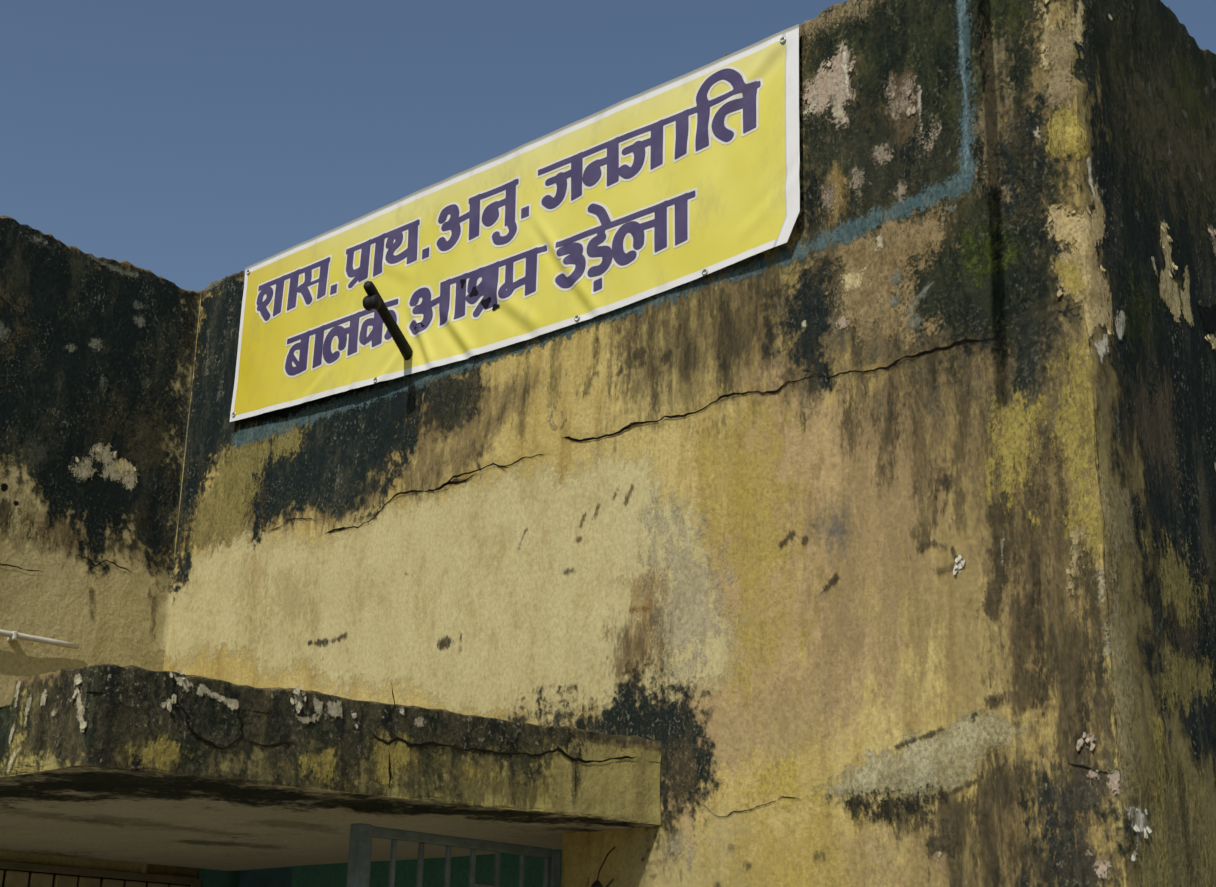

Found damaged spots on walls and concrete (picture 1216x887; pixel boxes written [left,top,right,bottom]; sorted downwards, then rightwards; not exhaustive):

peeling [802,40,857,129]
peeling [803,0,869,40]
peeling [1151,219,1216,349]
peeling [68,443,141,491]
leakage [0,218,490,636]
crack [260,338,999,536]
leakage [759,0,1216,887]
peeling [162,668,239,712]
crack [178,702,297,750]
leakage [0,655,720,861]